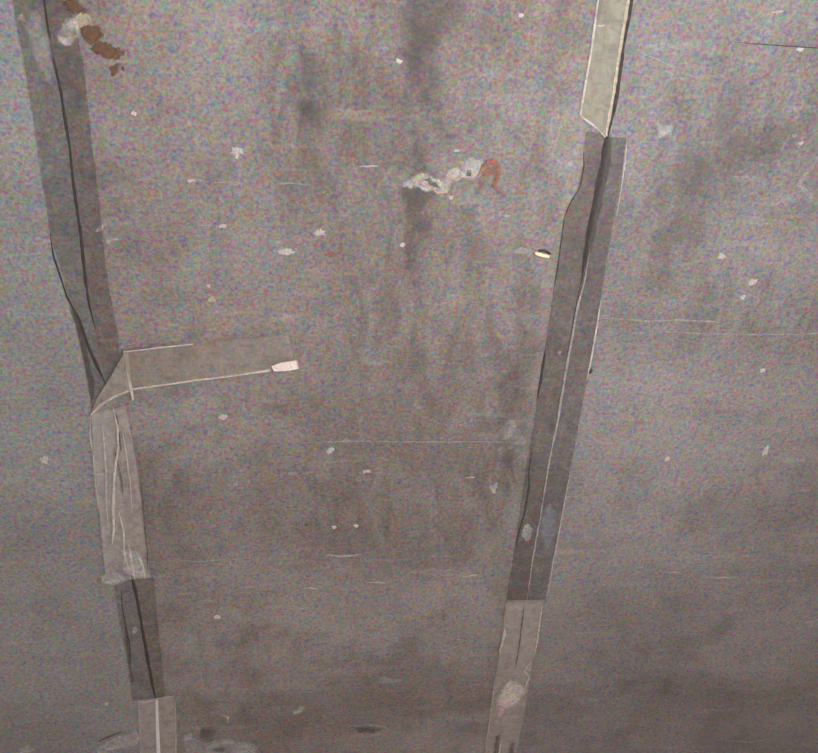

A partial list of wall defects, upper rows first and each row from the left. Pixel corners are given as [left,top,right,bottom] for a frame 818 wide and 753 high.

rust [56,0,125,77]
crack [43,0,106,396]
peeling [402,149,506,200]
crack [538,0,633,292]
crack [537,348,546,398]
crack [515,446,533,553]
crack [121,575,156,699]